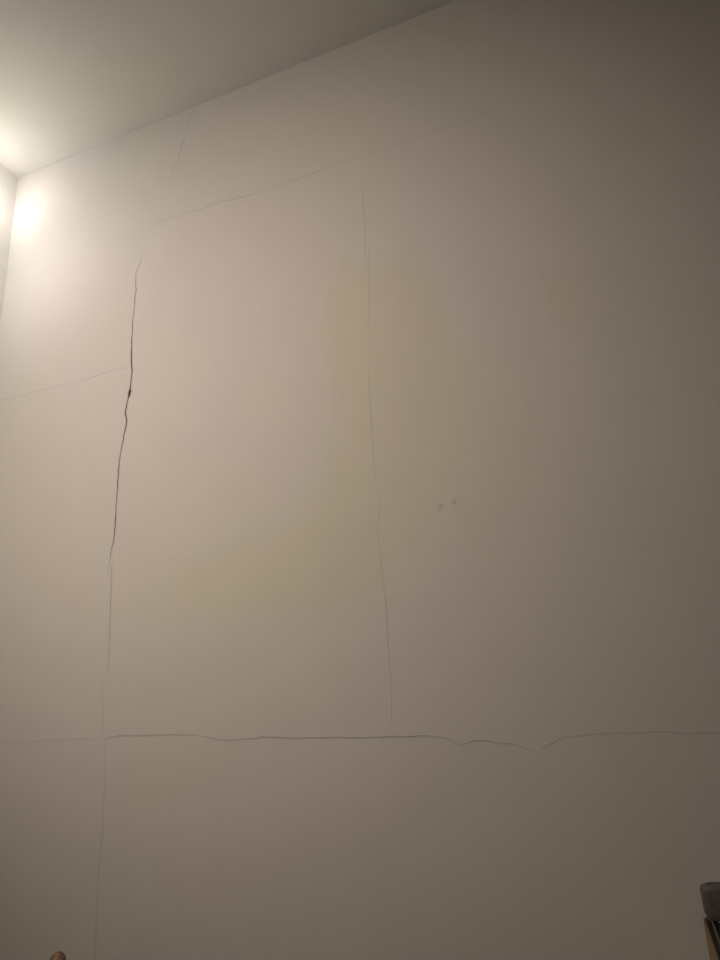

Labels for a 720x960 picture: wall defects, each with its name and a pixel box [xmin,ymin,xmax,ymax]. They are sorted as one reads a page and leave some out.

crack [0,255,720,960]